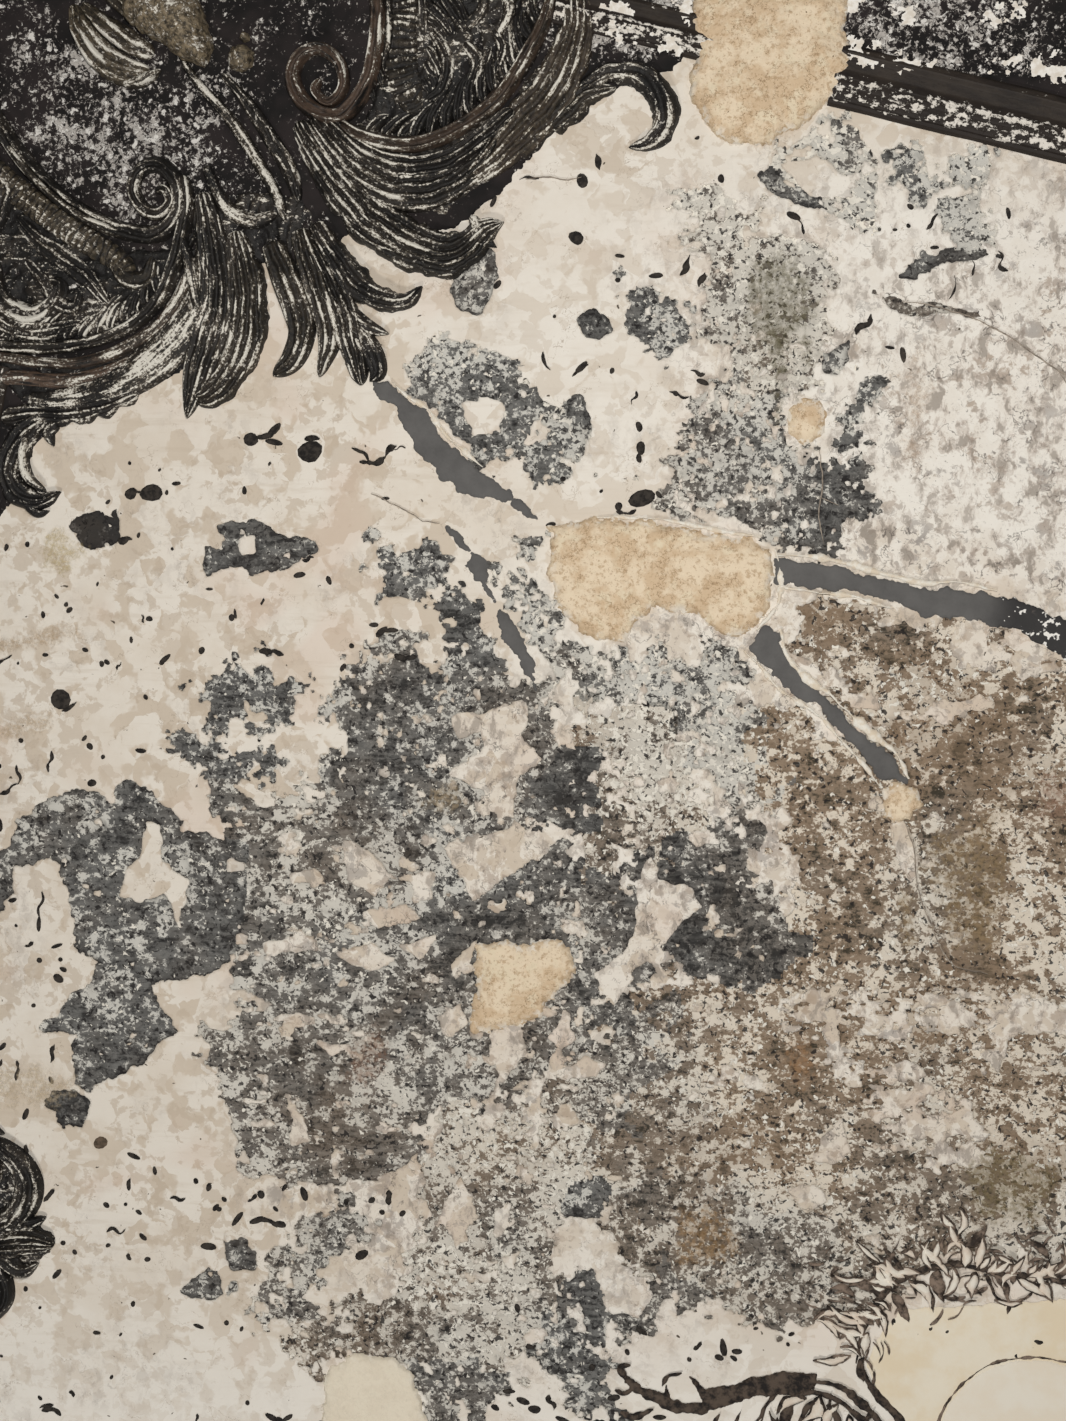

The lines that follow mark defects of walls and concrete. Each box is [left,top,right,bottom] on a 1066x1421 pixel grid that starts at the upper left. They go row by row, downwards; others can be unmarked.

peeling [450,248,501,316]
peeling [402,331,592,490]
peeling [568,231,584,245]
peeling [577,110,1011,564]
crack [373,380,538,691]
crack [597,449,1066,788]
peeling [979,620,1016,655]
peeling [0,519,845,1421]
crack [904,821,987,974]
peeling [903,1094,964,1119]
peeling [933,1134,968,1160]